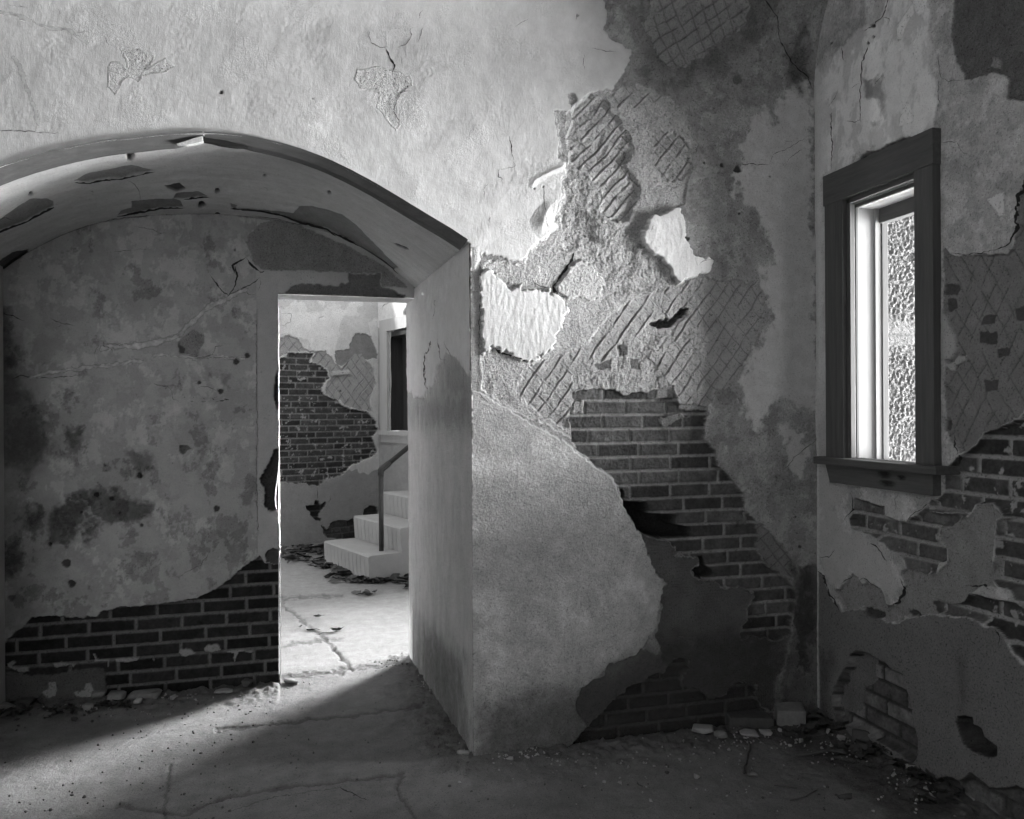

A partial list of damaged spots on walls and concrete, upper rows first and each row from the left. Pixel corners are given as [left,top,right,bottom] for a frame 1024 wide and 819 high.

peeling [109,48,174,93]
peeling [355,66,412,129]
peeling [75,165,154,182]
peeling [0,198,53,230]
peeling [117,183,208,216]
crack [211,258,264,296]
flaking render [979,315,1011,358]
flaking render [231,90,796,642]
flaking render [849,414,1024,660]
flaking render [5,547,279,704]
spalling [826,651,918,779]
spalling [956,716,997,757]